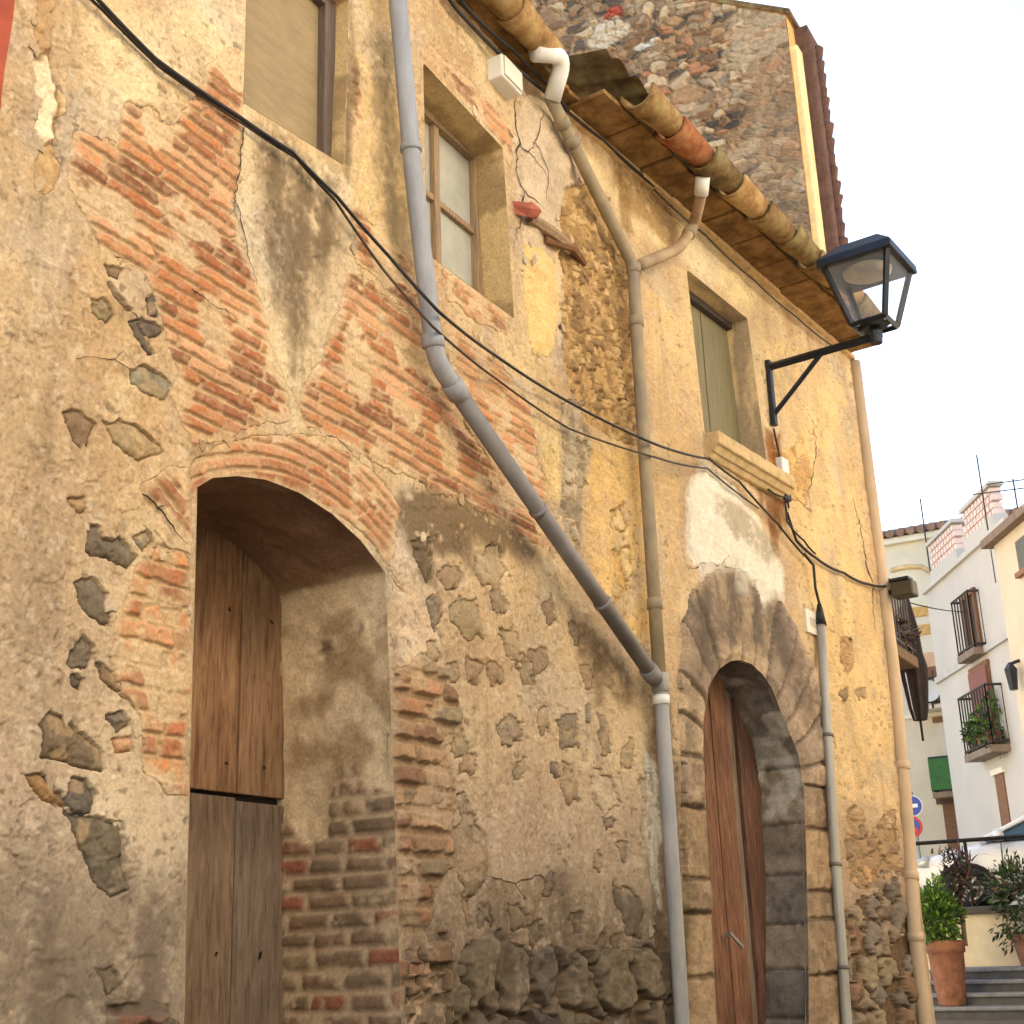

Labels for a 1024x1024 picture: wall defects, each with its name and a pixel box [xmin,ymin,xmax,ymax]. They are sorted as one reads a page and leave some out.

crack [229,128,257,284]
damp [267,149,333,331]
crack [513,101,549,248]
crack [142,493,187,544]
peeling [29,0,558,797]
spalling [558,175,636,552]
spalling [609,502,635,618]
crack [794,425,817,510]
spalling [24,710,129,897]
spalling [390,531,674,1024]